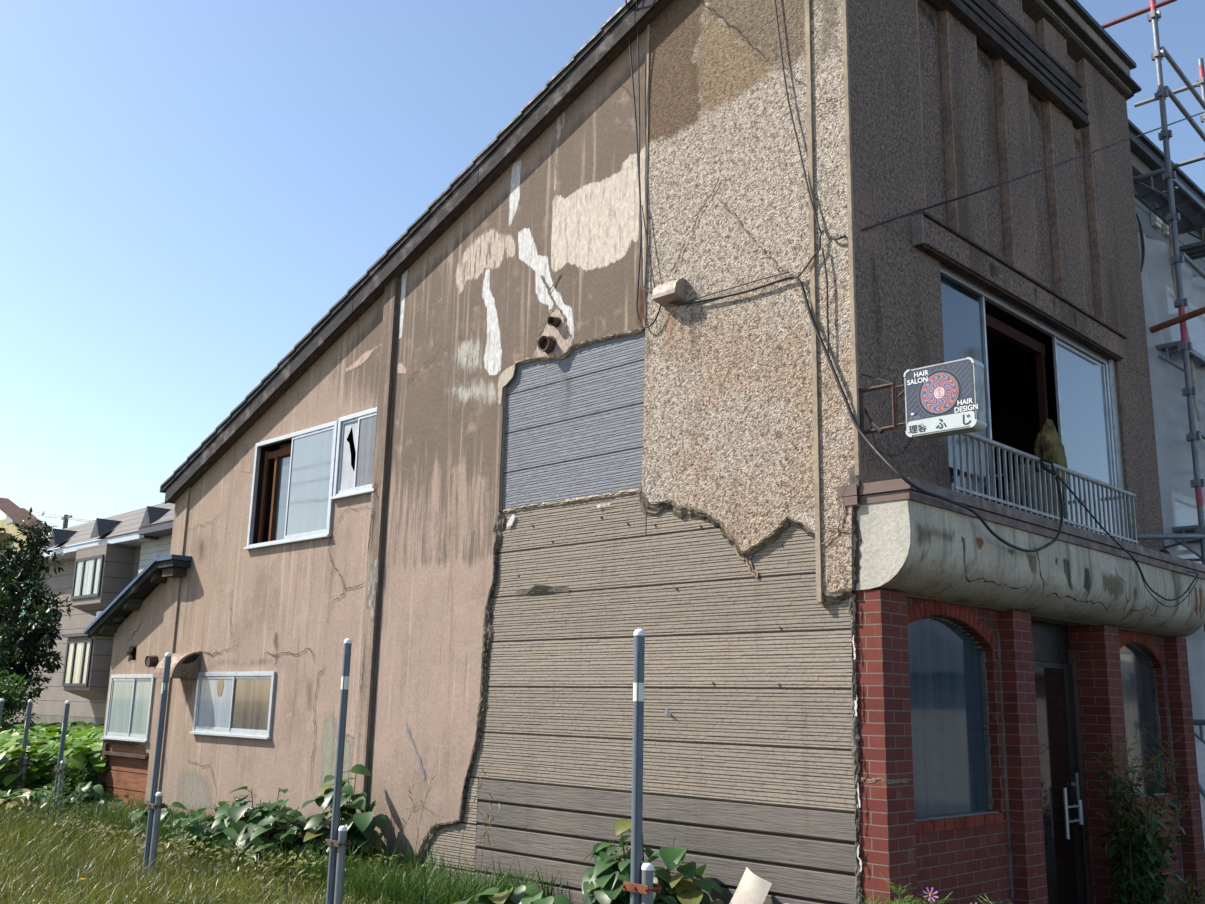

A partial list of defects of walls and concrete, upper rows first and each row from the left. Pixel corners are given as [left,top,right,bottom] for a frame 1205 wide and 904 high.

peeling [452,110,646,403]
crack [199,598,354,788]
crack [327,483,377,620]
flaking render [412,485,815,869]
flaking render [818,588,856,660]
crack [962,539,1152,616]
damp [1056,559,1136,599]